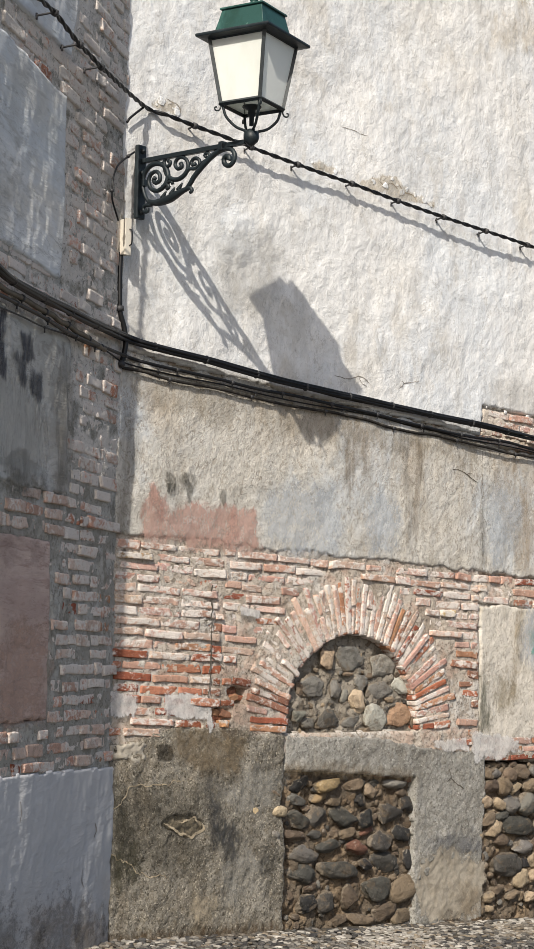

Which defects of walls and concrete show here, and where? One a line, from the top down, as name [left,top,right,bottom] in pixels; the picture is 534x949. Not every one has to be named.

water stain [0,308,49,484]
flaking render [161,815,205,839]
water stain [164,693,246,859]